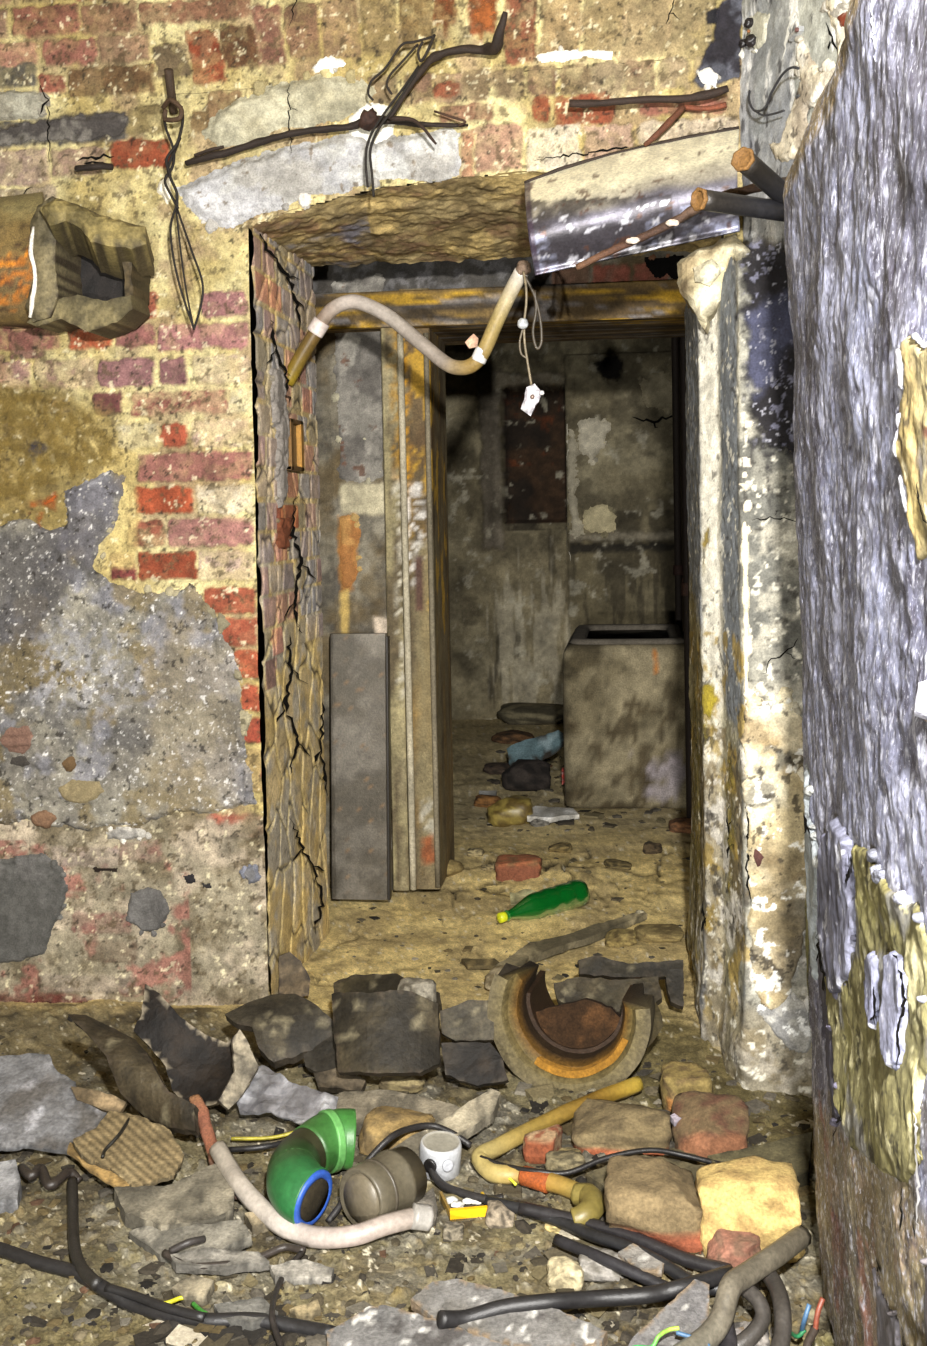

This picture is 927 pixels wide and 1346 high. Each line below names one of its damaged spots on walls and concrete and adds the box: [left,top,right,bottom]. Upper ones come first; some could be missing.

peeling [769,0,849,162]
spalling [28,227,37,318]
crack [260,234,305,402]
leakage [0,389,113,500]
peeling [892,332,927,560]
peeling [0,470,257,844]
crack [277,496,328,796]
crack [291,820,325,934]
peeling [739,457,927,1184]
peeling [872,1267,901,1346]